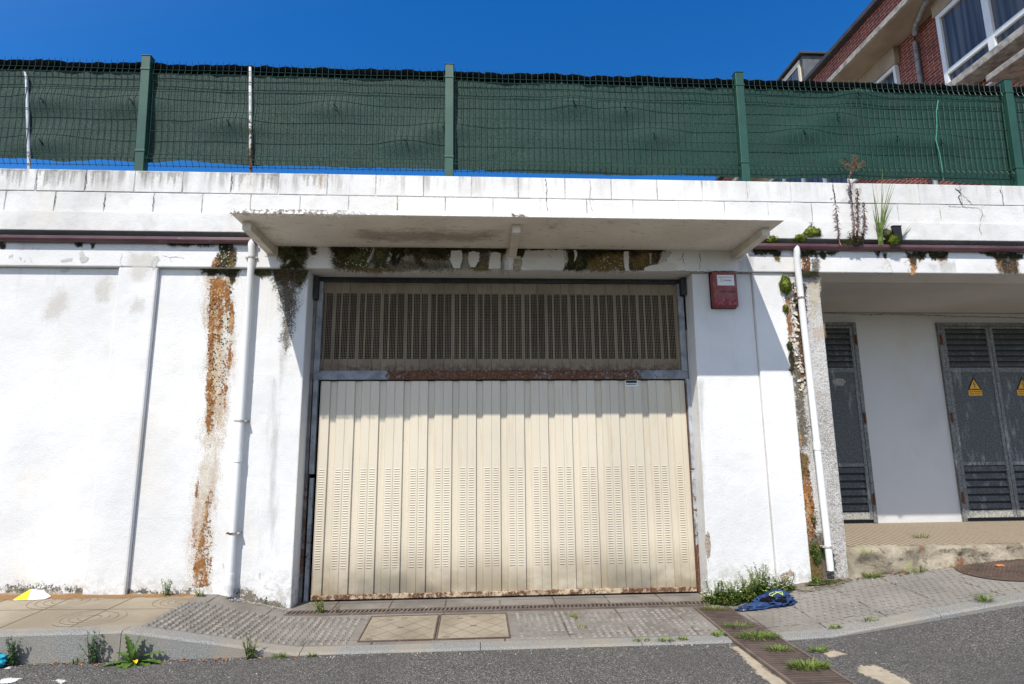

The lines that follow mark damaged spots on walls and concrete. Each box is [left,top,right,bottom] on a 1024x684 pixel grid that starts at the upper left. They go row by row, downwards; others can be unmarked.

water stain [270,246,310,352]
water stain [330,247,507,275]
water stain [529,249,664,274]
crack [950,188,1004,230]
rust [979,252,1024,276]
rust [204,277,235,434]
rust [192,478,214,588]
rust [798,429,817,542]